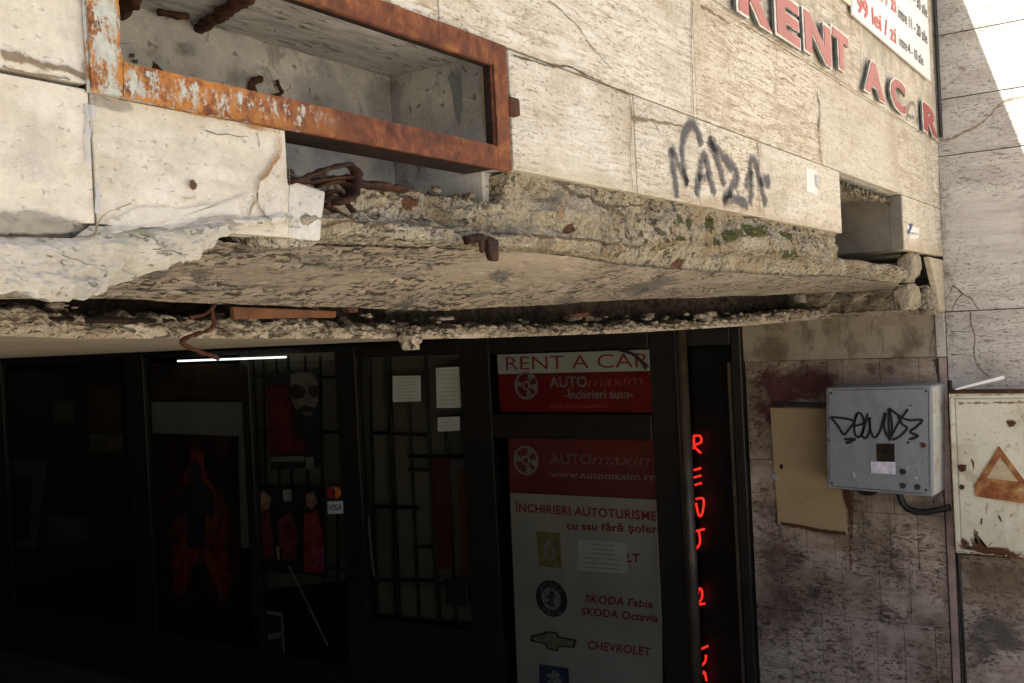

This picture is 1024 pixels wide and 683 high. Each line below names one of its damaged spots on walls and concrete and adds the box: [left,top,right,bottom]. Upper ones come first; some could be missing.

rust [119,0,142,21]
rust [157,0,255,35]
crack [940,95,1023,141]
peeling [109,194,256,233]
crack [205,130,292,234]
rust [362,180,419,210]
spalling [287,162,908,298]
spalling [148,270,171,283]
flaking render [0,302,831,339]
crack [929,285,990,377]